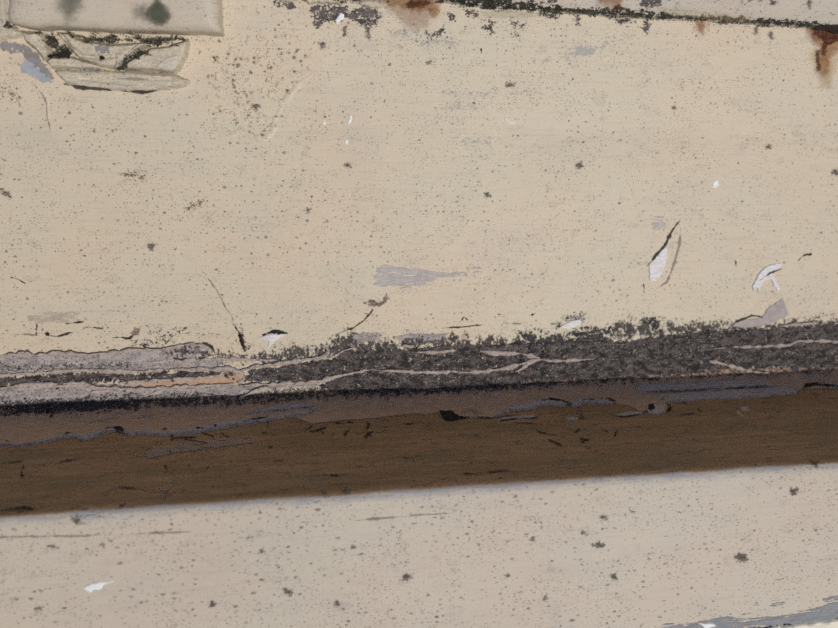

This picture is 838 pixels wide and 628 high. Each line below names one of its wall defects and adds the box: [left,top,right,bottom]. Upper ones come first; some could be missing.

corrosion [384,0,439,15]
peeling [0,41,54,83]
corrosion [811,24,838,73]
peeling [648,214,682,288]
peeling [729,263,818,328]
peeling [258,330,288,348]
peeling [551,311,585,330]
peeling [0,333,838,447]
peeling [83,581,113,593]
peeling [664,596,838,628]